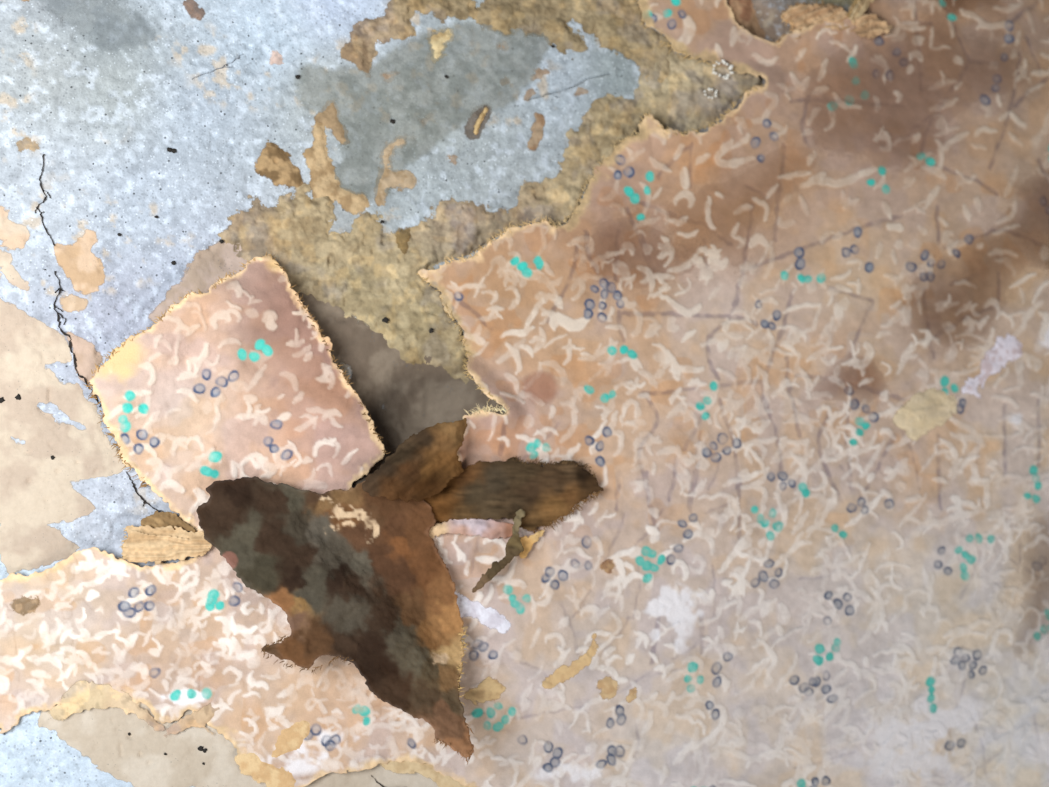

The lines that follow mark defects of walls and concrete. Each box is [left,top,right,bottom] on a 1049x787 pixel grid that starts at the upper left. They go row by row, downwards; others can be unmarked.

peeling [712,59,734,80]
spalling [464,104,492,140]
crack [36,154,55,246]
crack [45,269,101,407]
crack [126,471,163,512]